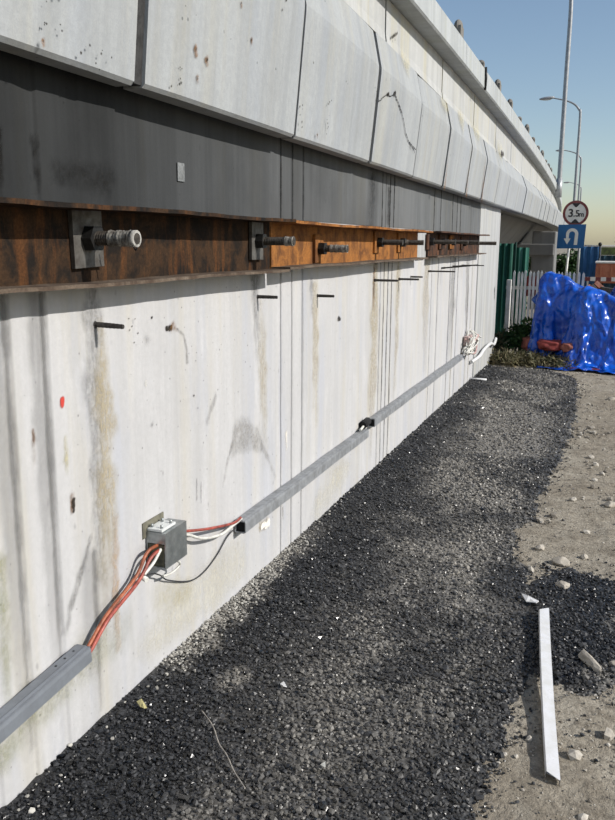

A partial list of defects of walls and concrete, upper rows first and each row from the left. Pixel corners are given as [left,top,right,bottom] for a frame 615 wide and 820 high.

crack [376,91,416,153]